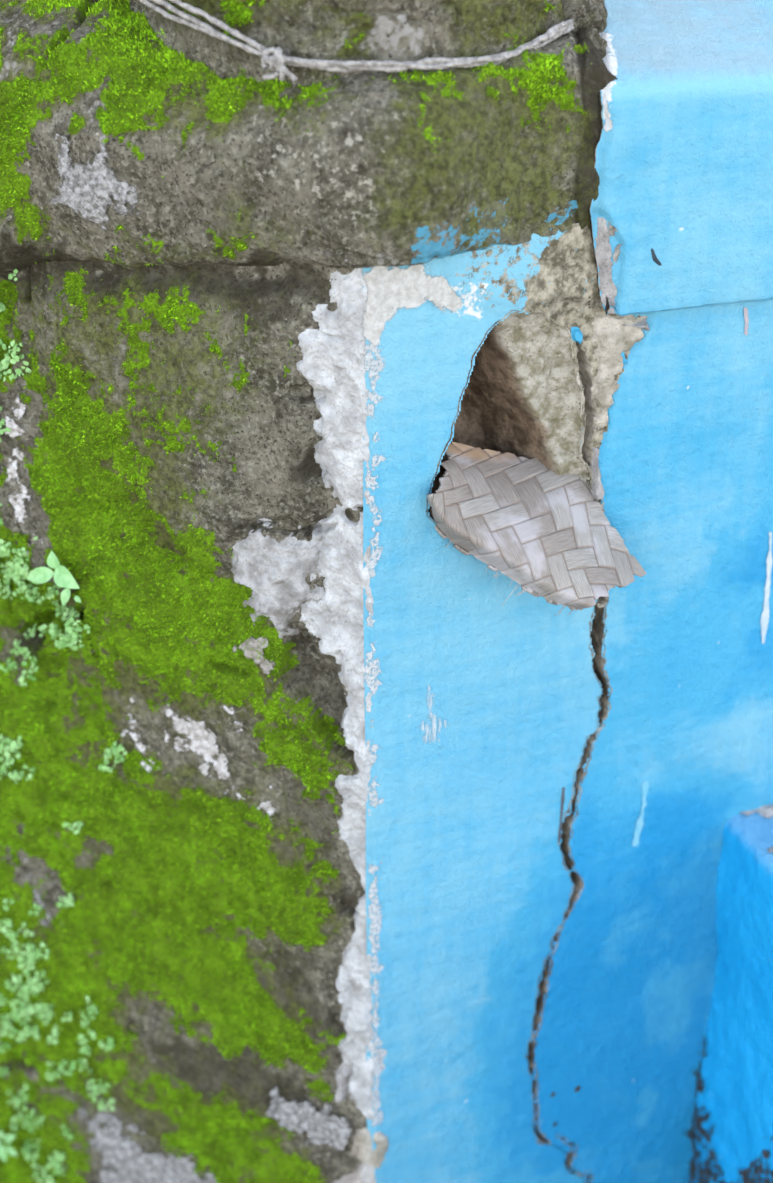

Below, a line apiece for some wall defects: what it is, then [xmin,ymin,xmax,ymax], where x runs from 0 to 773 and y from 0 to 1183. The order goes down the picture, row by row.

spalling [571,217,650,429]
crack [574,340,605,513]
spalling [589,447,605,500]
spalling [231,264,462,1183]
crack [525,591,613,1183]
peeling [740,804,773,818]
mould [682,1028,773,1183]